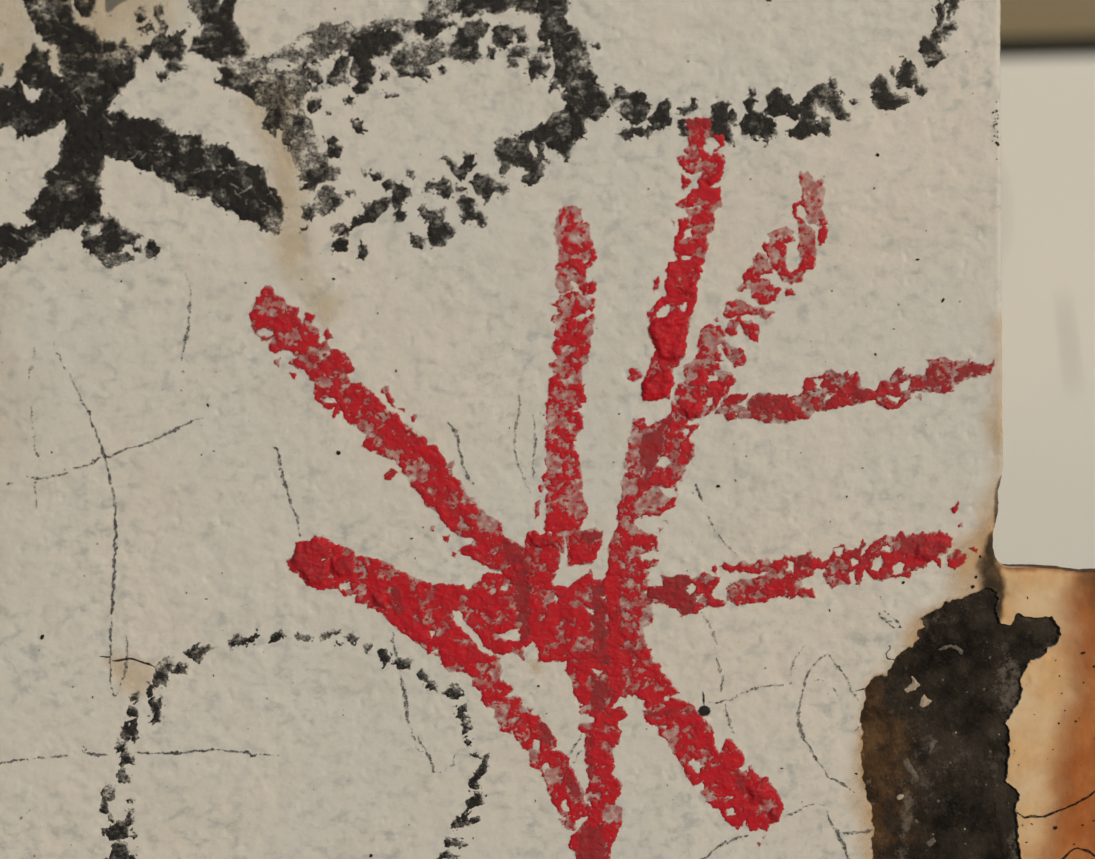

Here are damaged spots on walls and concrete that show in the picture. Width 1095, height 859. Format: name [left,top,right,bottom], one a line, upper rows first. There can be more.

crack [99,656,155,667]
rust [959,534,1095,859]